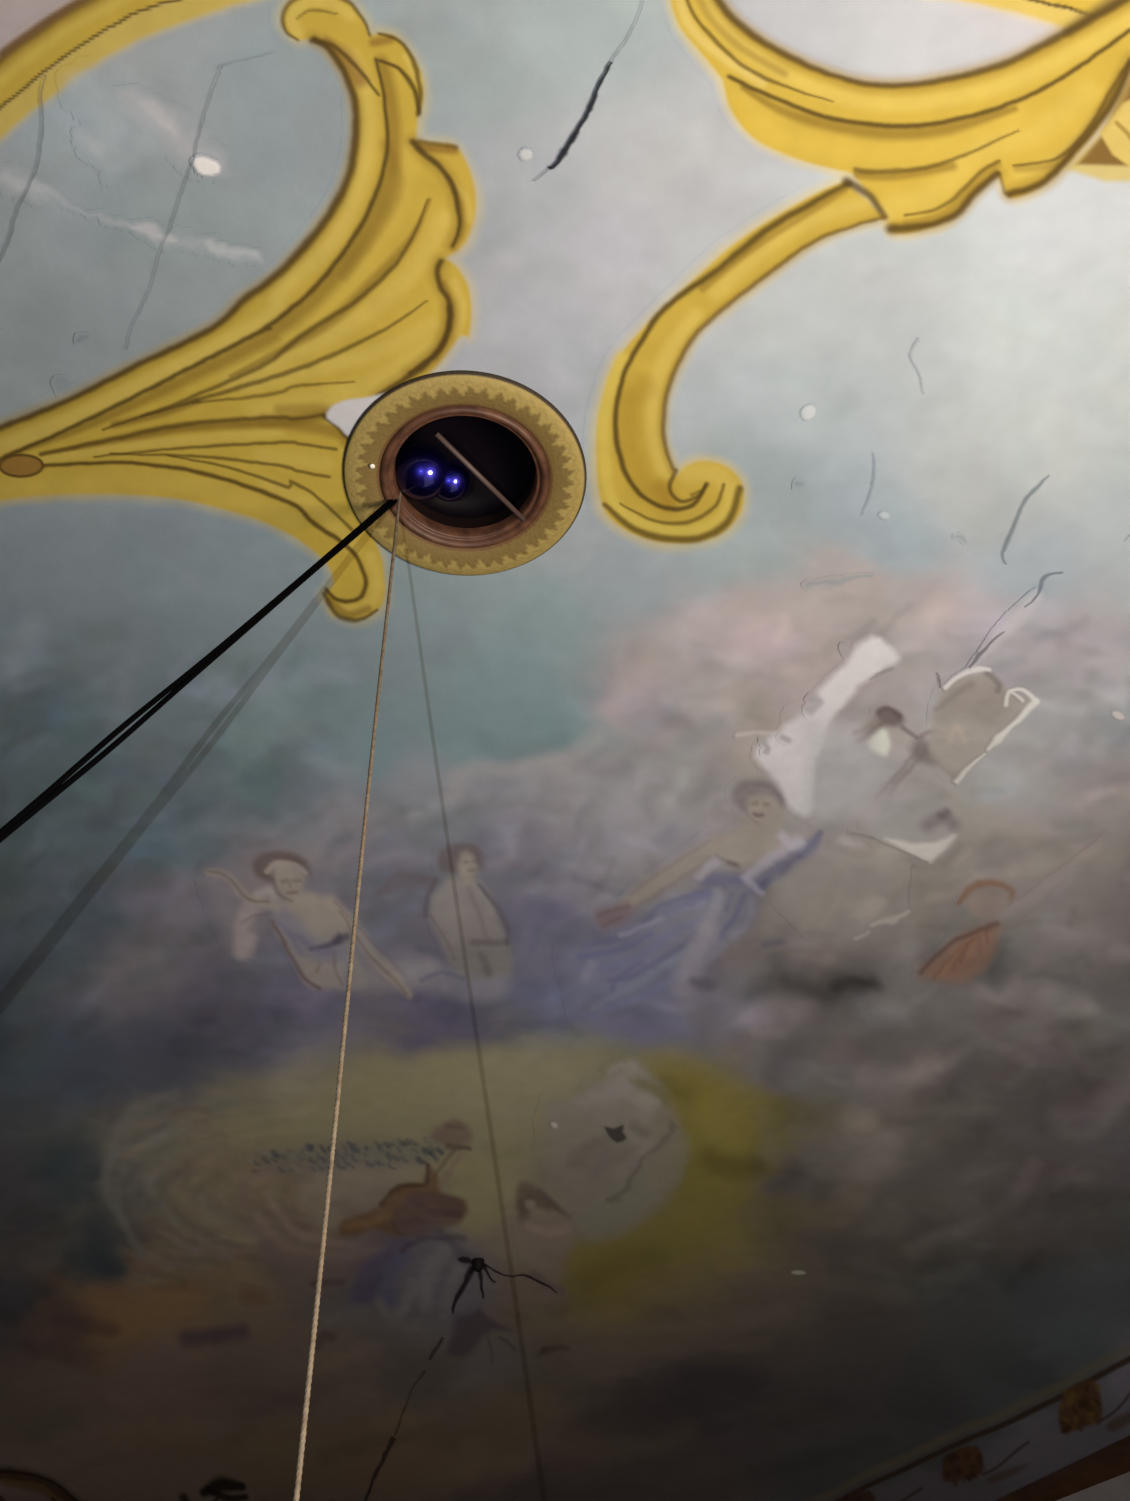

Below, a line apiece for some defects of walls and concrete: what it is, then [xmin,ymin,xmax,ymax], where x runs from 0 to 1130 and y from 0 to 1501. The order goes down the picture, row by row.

crack [534,62,612,181]
spalling [941,587,1047,692]
peeling [733,631,904,830]
spalling [952,686,1042,786]
crack [365,1257,557,1501]